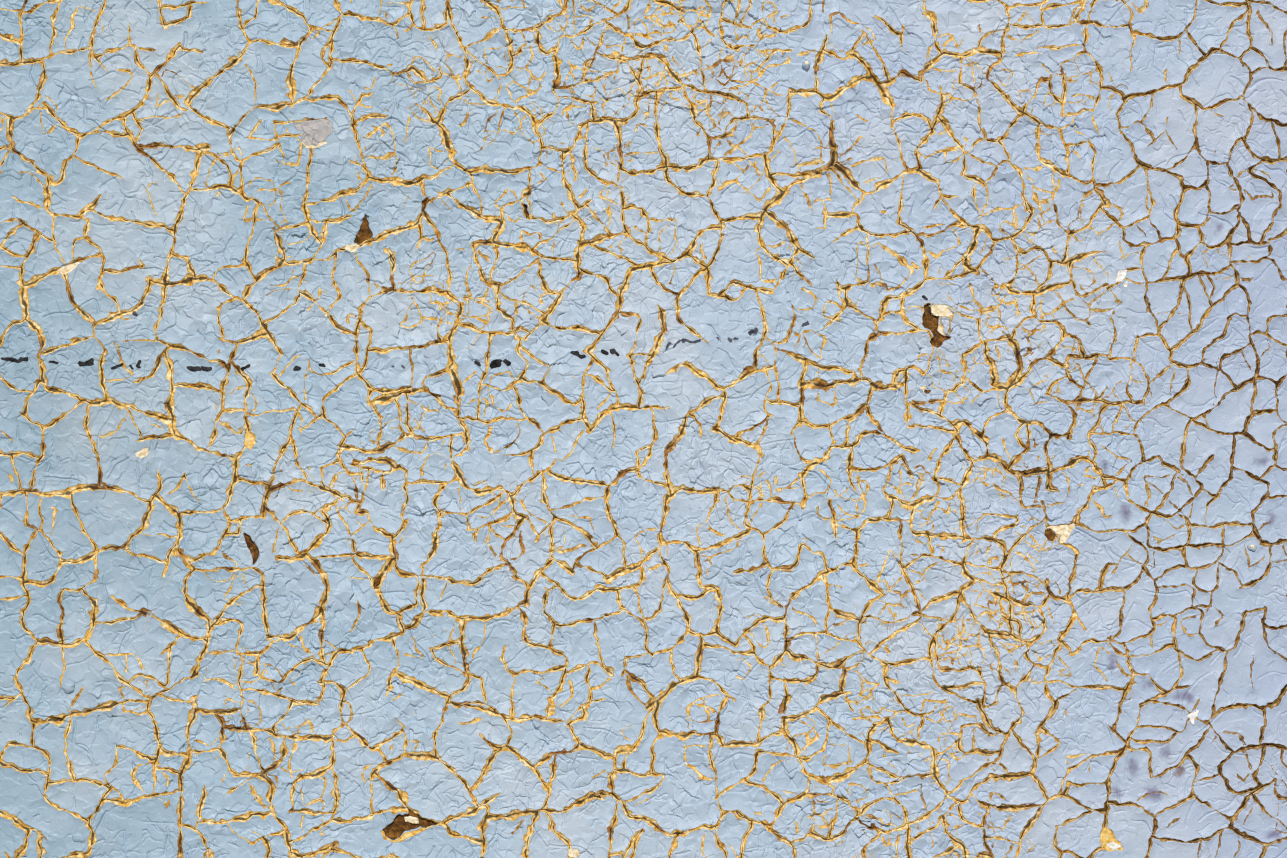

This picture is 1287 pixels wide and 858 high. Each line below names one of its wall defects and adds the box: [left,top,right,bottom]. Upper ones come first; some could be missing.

crack [719,0,813,52]
crack [829,12,860,33]
crack [874,15,905,49]
crack [1256,10,1273,44]
crack [1244,190,1274,201]
spalling [345,215,373,252]
spalling [923,304,953,348]
crack [794,330,827,359]
crack [350,596,361,632]
crack [686,694,719,729]
crack [684,744,713,781]
spalling [381,809,437,843]